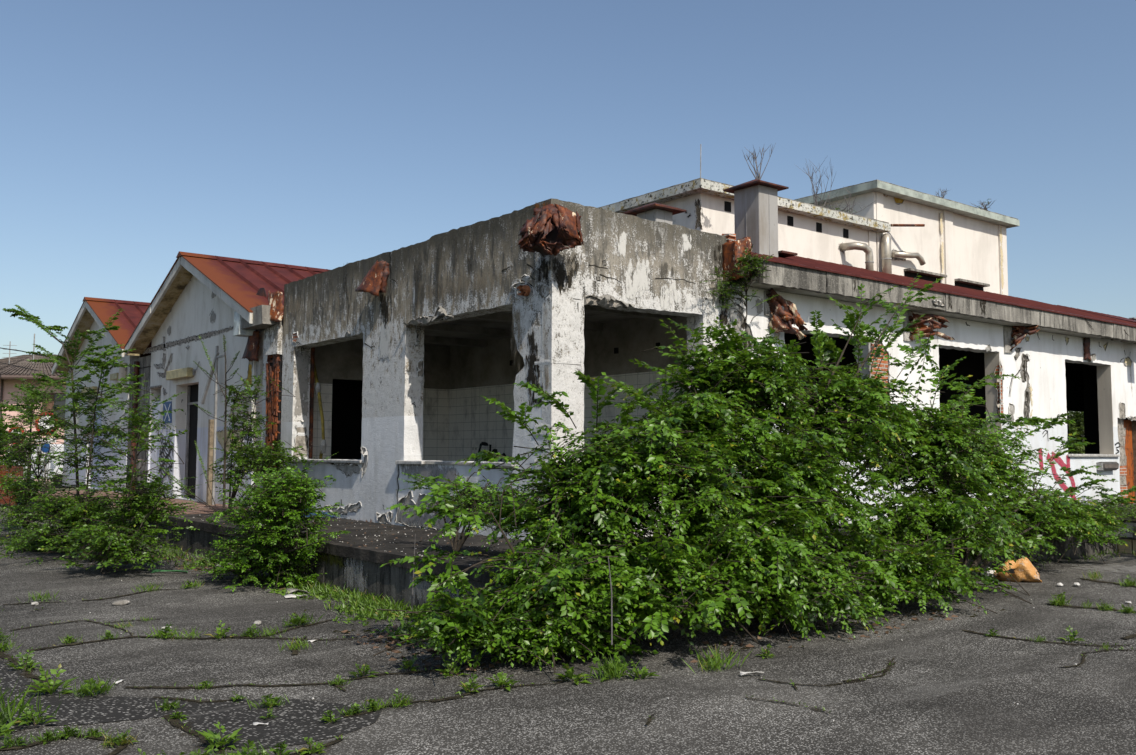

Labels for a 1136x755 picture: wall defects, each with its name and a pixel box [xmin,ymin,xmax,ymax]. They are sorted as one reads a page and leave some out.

leakage [682,199,711,252]
leakage [535,253,582,297]
leakage [616,231,679,310]
rust [256,288,284,322]
leakage [512,311,543,408]
flaking render [869,339,891,396]
peeling [326,446,368,479]
peeling [376,490,459,532]
crack [0,589,356,693]
crack [963,578,1136,669]
crack [124,663,567,755]
crack [746,658,896,714]